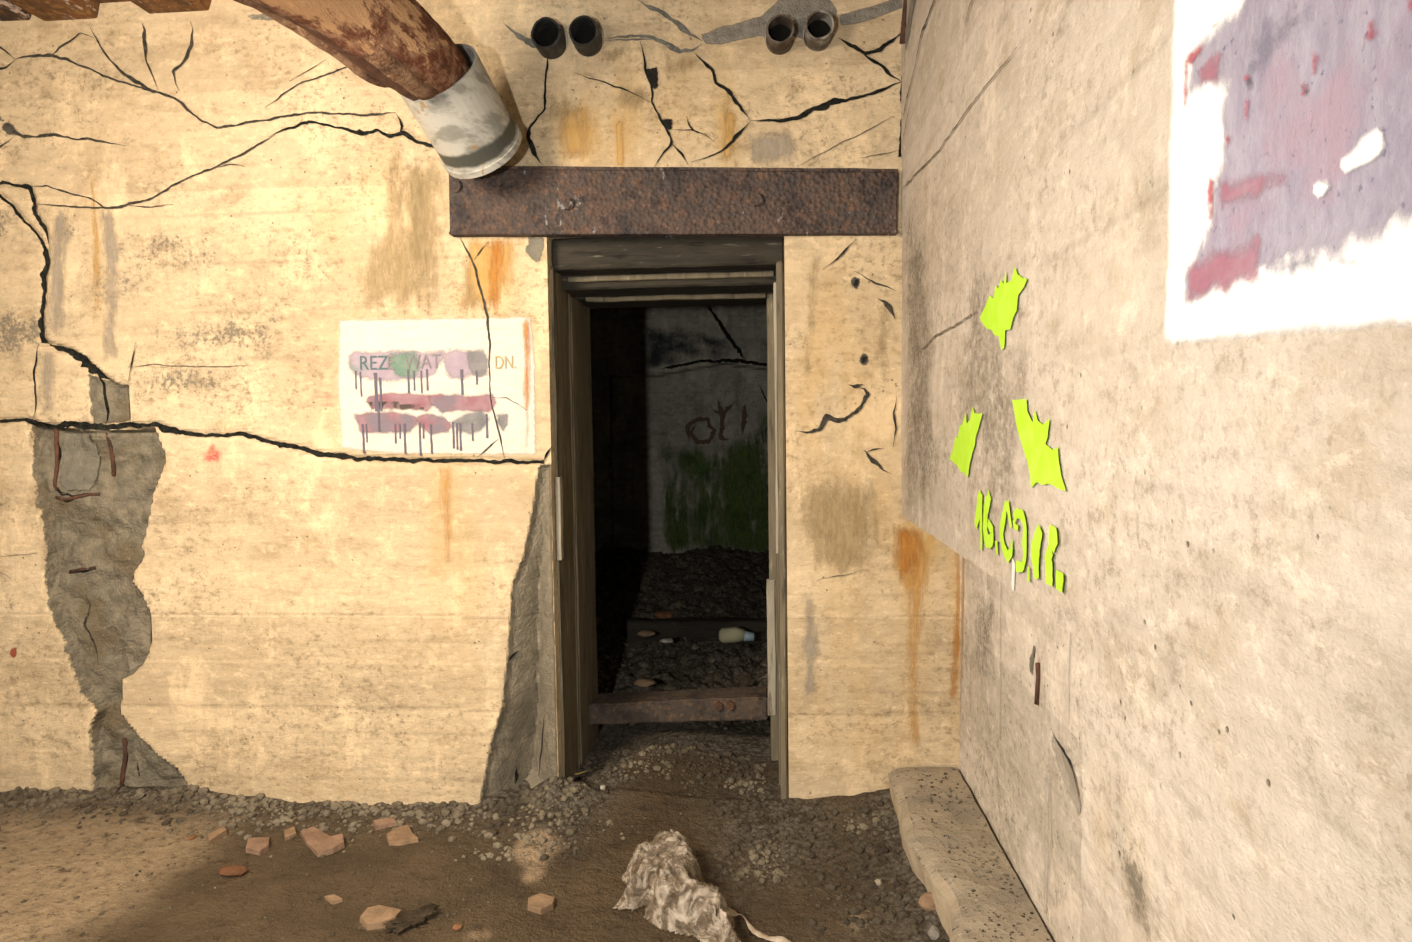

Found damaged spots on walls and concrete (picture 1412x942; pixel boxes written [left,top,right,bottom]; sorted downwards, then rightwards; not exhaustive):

spalling [0,117,16,135]
crack [503,0,1017,187]
crack [0,22,551,464]
crack [662,306,767,402]
crack [918,312,975,352]
crack [795,384,897,473]
damp [809,489,871,568]
spalling [32,374,188,790]
corrosion [896,529,927,675]
corrosion [950,558,964,696]
spalling [1051,730,1082,813]